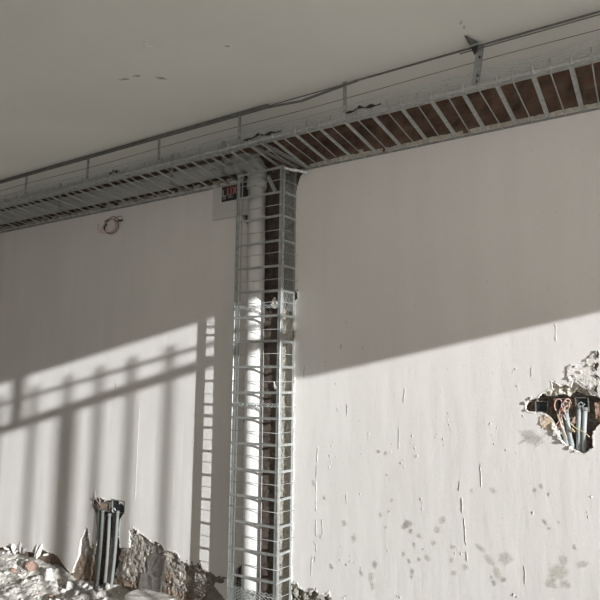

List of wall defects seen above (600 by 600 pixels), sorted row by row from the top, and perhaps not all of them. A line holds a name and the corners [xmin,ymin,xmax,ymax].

spalling [522,350,600,455]
spalling [0,497,226,600]